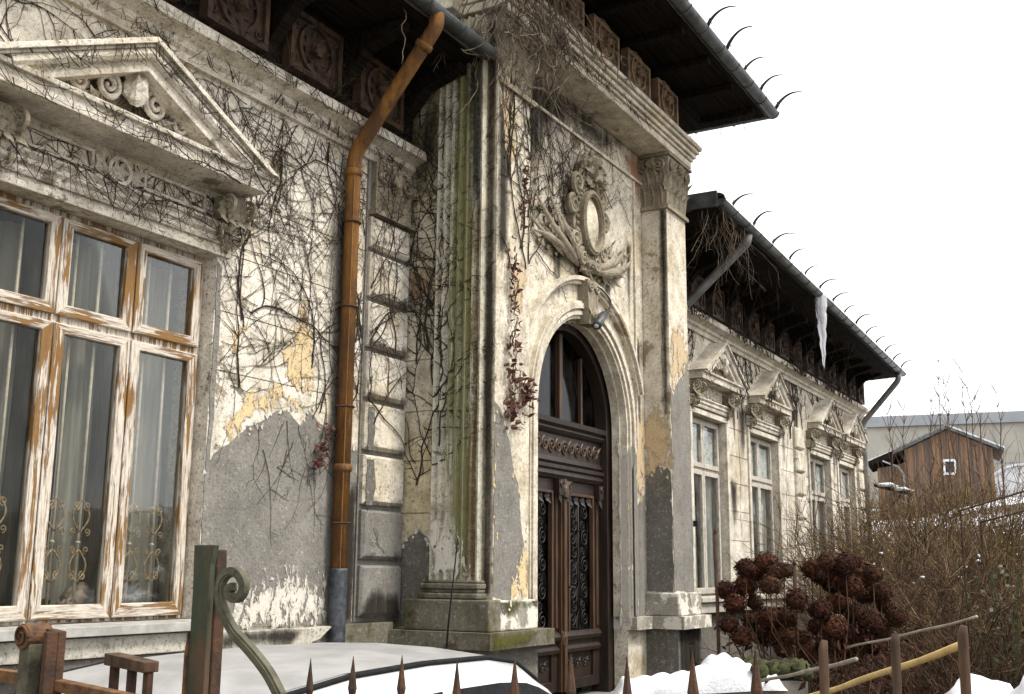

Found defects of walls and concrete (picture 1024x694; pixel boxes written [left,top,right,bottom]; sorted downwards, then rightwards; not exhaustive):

spalling [201,262,335,643]
spalling [617,325,694,628]